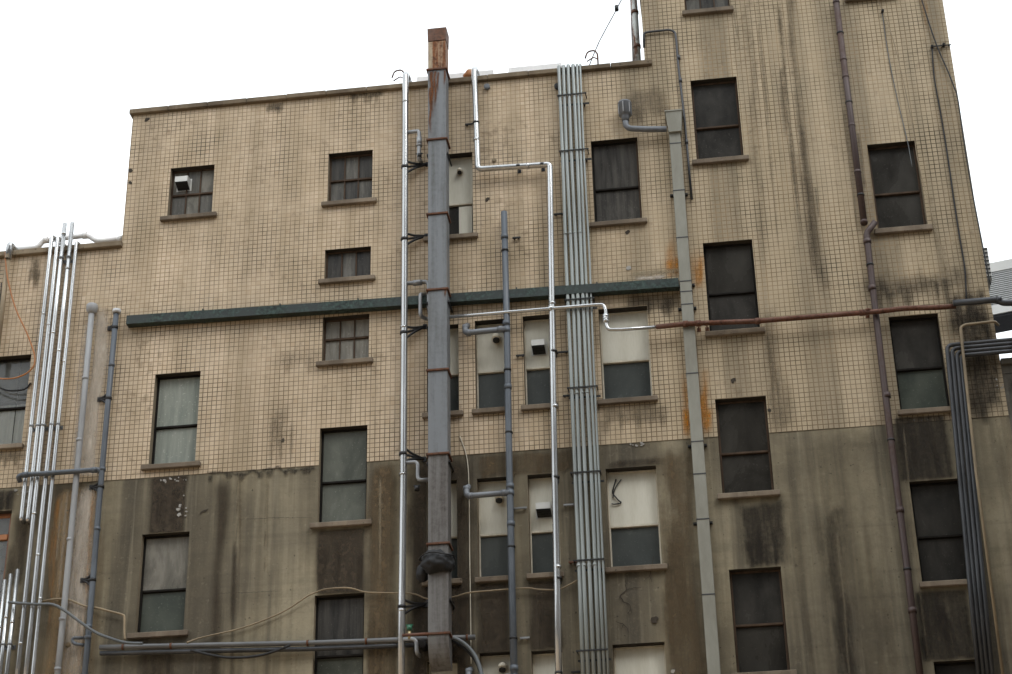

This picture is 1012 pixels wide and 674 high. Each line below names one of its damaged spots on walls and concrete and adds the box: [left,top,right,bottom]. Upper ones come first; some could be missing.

damp [209,466,310,567]